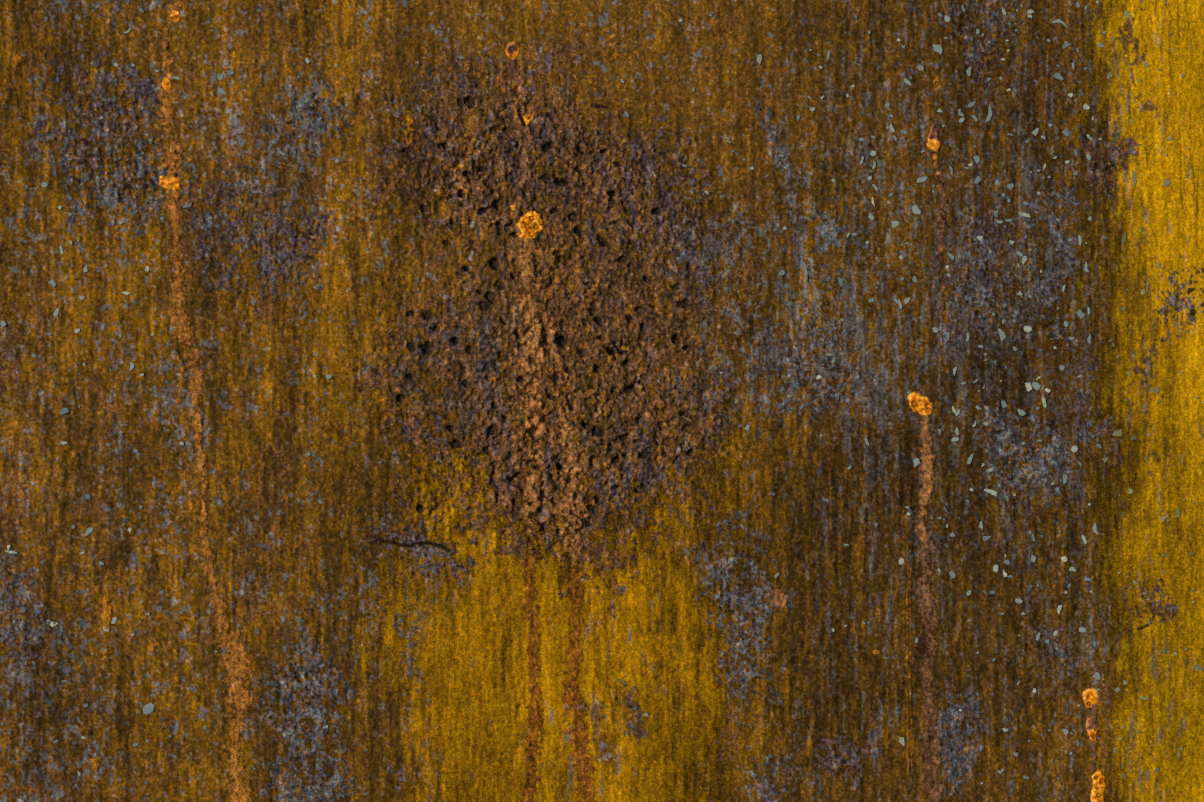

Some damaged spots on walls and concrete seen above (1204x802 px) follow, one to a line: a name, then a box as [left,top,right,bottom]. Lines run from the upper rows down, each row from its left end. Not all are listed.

peeling [859,136,893,220]
corrosion [31,0,883,802]
corrosion [903,392,990,802]
corrosion [1034,616,1106,802]